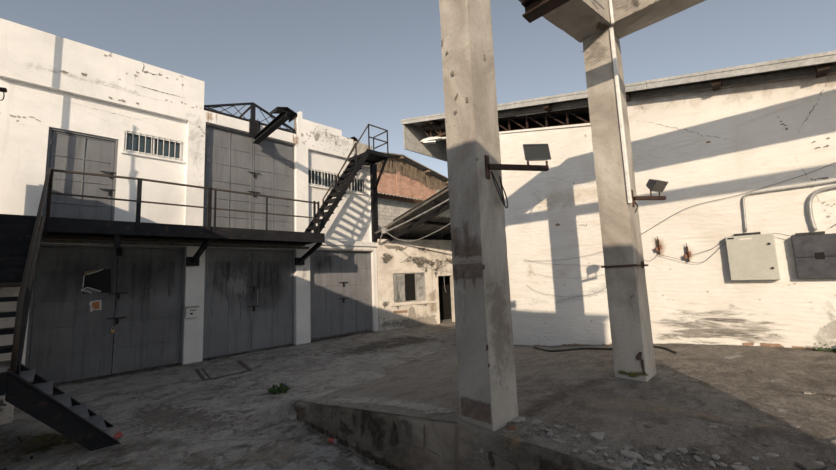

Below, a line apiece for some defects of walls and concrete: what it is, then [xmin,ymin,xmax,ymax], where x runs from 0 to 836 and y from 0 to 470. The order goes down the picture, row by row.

damp [658,312,773,344]
damp [295,396,456,470]